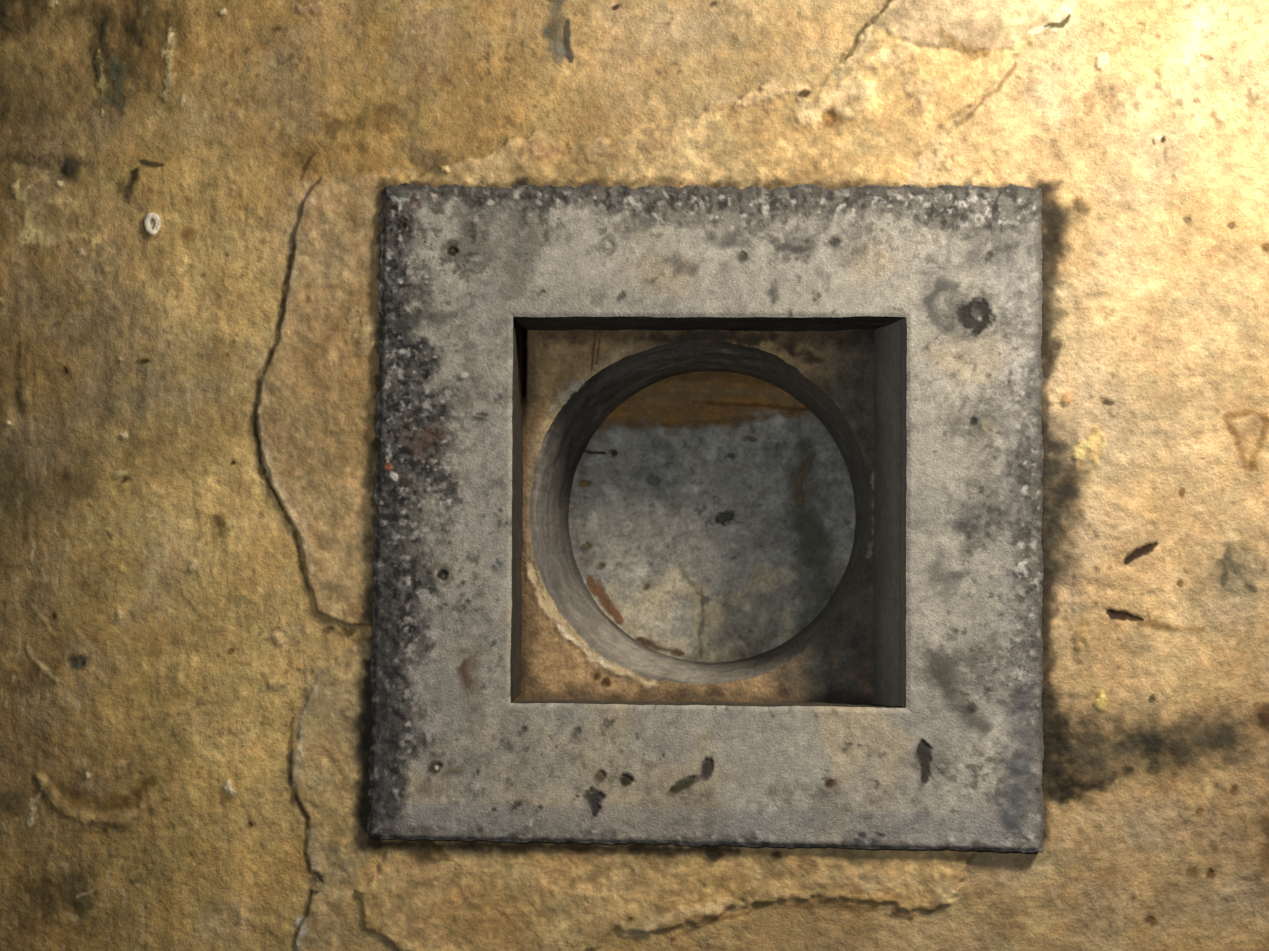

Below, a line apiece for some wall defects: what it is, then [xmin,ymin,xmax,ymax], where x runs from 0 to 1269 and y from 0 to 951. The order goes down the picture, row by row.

crack [846,0,891,59]
crack [1045,14,1071,27]
crack [957,63,1018,126]
crack [591,333,601,370]
crack [254,246,309,589]
rust [599,371,808,429]
rust [587,576,623,624]
rust [637,637,684,656]
water stain [1041,552,1114,802]
crack [287,717,312,937]
crack [862,907,913,920]